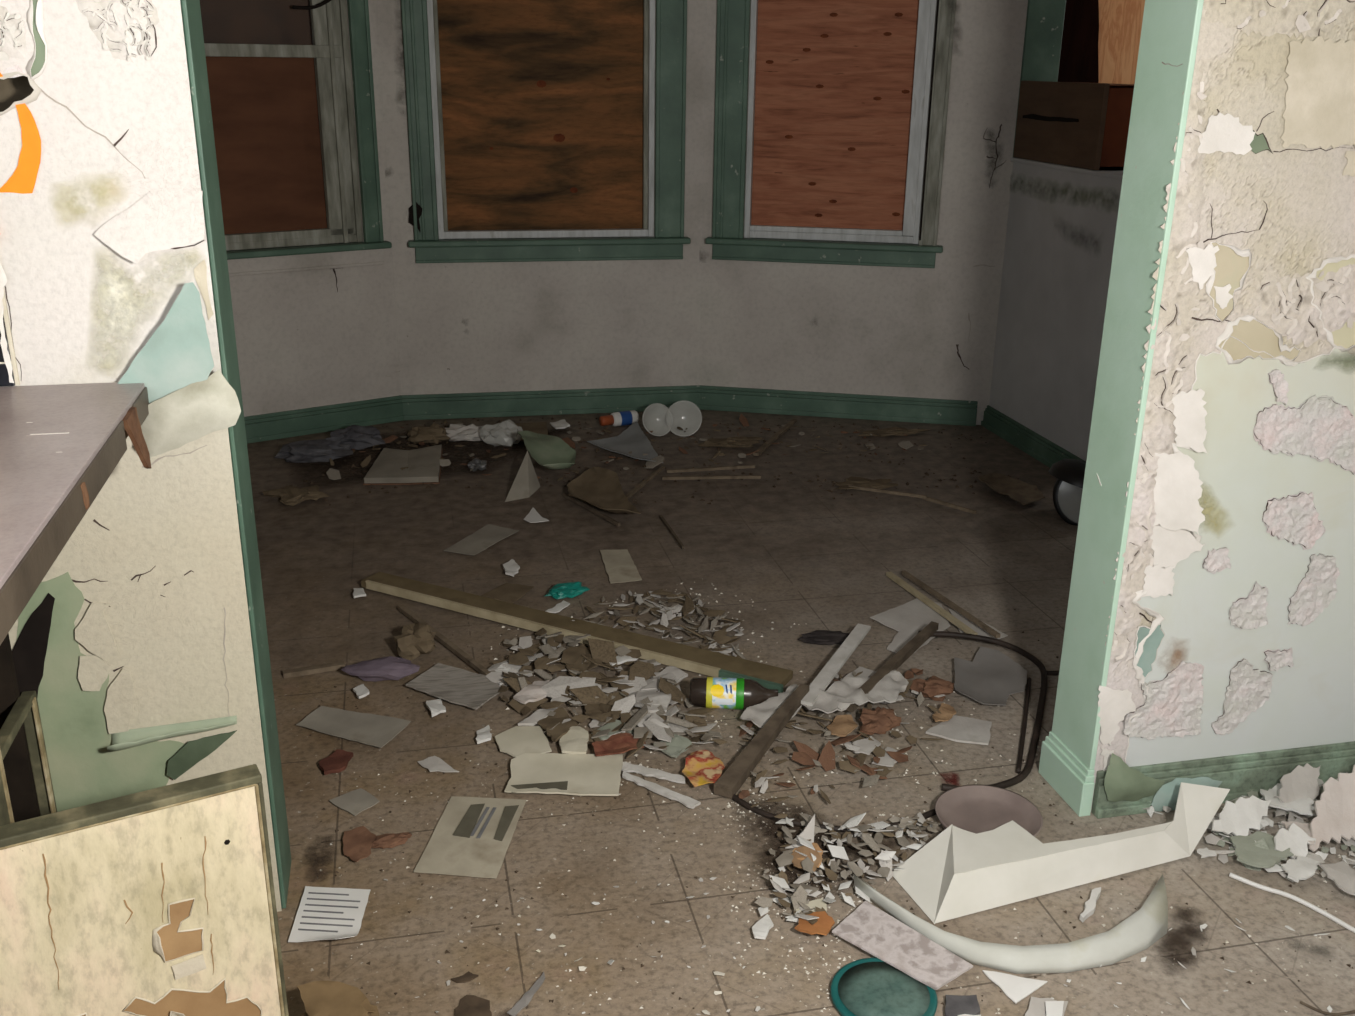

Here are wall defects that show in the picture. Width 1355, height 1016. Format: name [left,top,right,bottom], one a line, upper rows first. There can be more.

crack [39,87,146,179]
peeling [0,263,14,383]
peeling [1098,0,1355,817]
peeling [16,572,237,812]